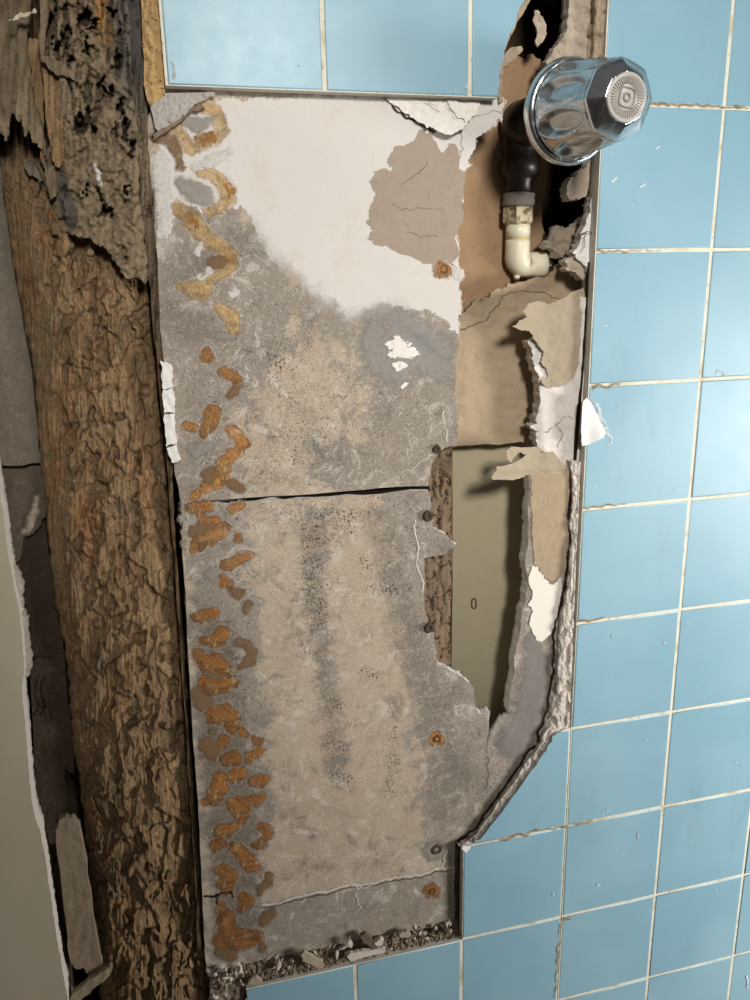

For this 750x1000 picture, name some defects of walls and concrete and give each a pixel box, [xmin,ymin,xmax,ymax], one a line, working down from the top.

crack [387,101,435,133]
peeling [150,92,507,389]
corrosion [432,260,454,279]
flaking render [539,159,593,282]
corrosion [179,347,255,615]
crack [210,410,448,503]
flaking render [13,560,34,678]
damp [302,507,357,626]
crack [262,231,592,911]
flaking render [455,296,606,853]
corrosion [189,607,276,962]
corrosion [420,882,442,900]